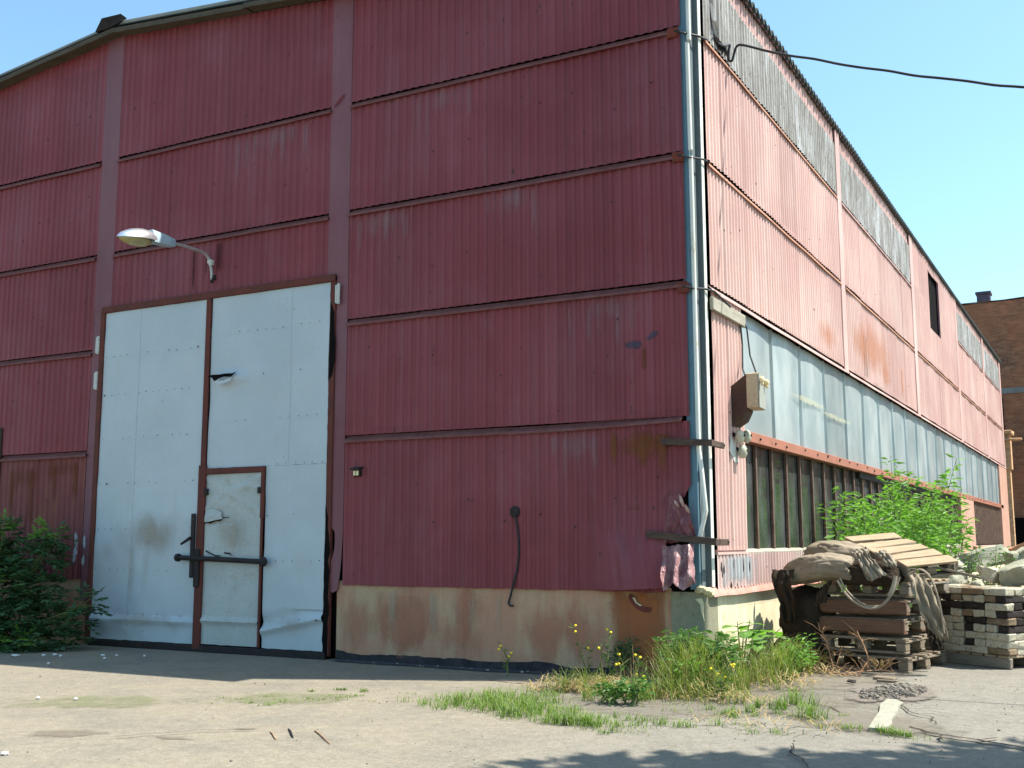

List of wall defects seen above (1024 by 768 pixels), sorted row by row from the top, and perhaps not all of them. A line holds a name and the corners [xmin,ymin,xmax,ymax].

corrosion [616,592,664,675]